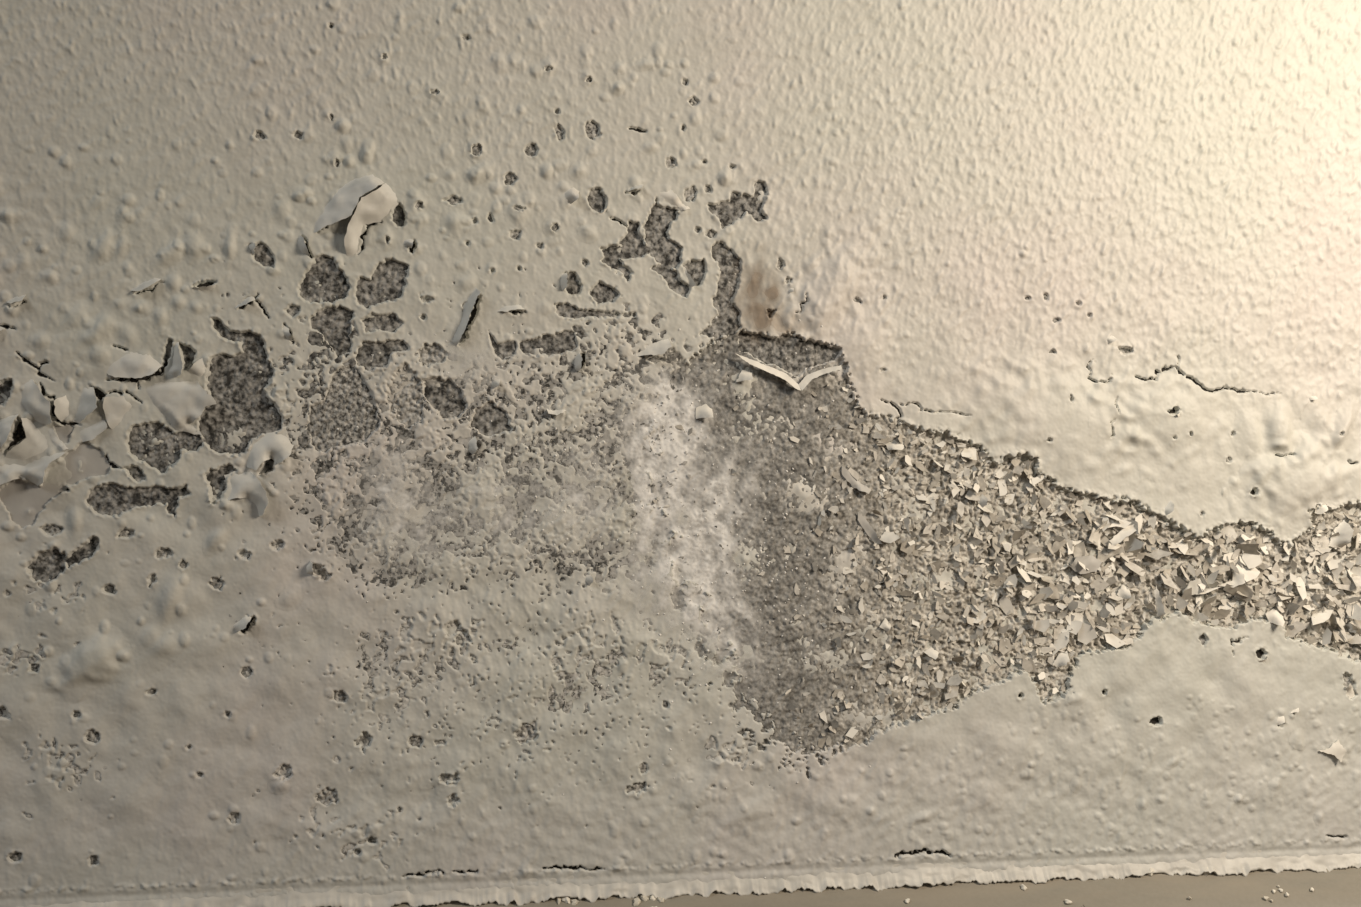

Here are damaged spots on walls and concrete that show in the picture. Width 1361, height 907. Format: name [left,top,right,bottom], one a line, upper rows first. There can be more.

flaking render [0,173,1361,806]
crack [1086,357,1272,436]